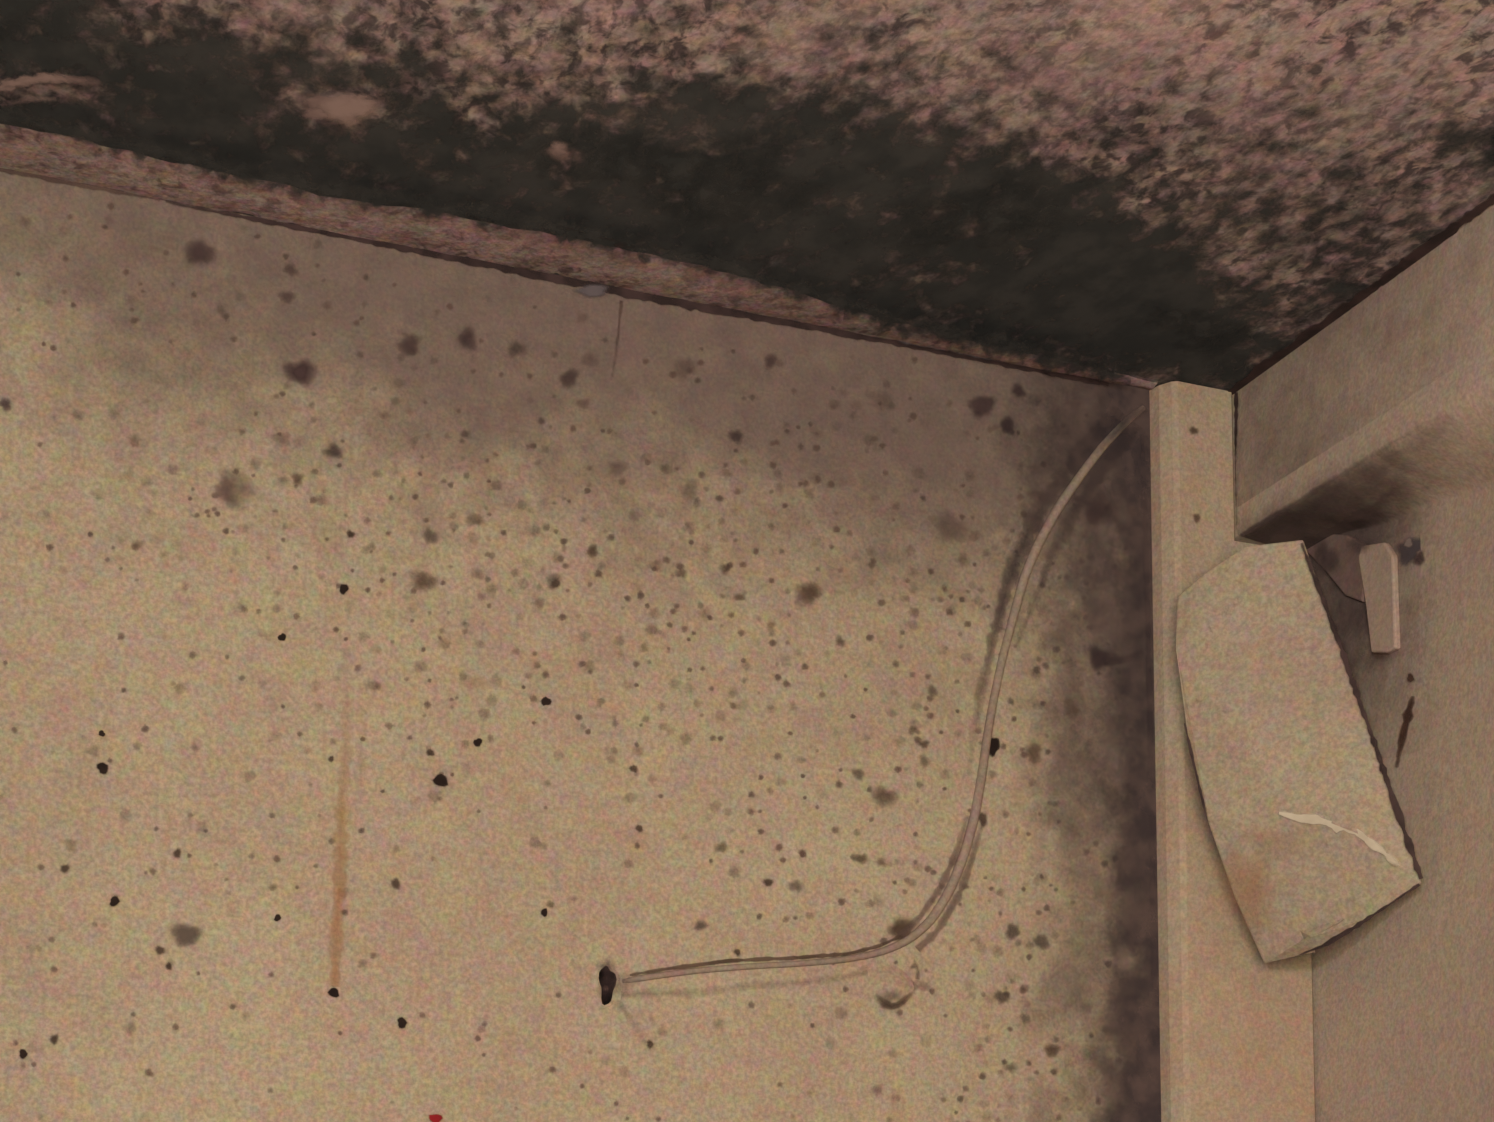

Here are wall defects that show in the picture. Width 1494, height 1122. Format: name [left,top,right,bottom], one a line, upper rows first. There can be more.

damp [1227,134,1313,163]
damp [1421,120,1494,193]
damp [280,362,312,396]
damp [802,586,818,600]
damp [915,687,942,760]
damp [989,738,1005,756]
damp [433,773,453,786]
damp [837,769,893,801]
damp [1027,936,1048,959]